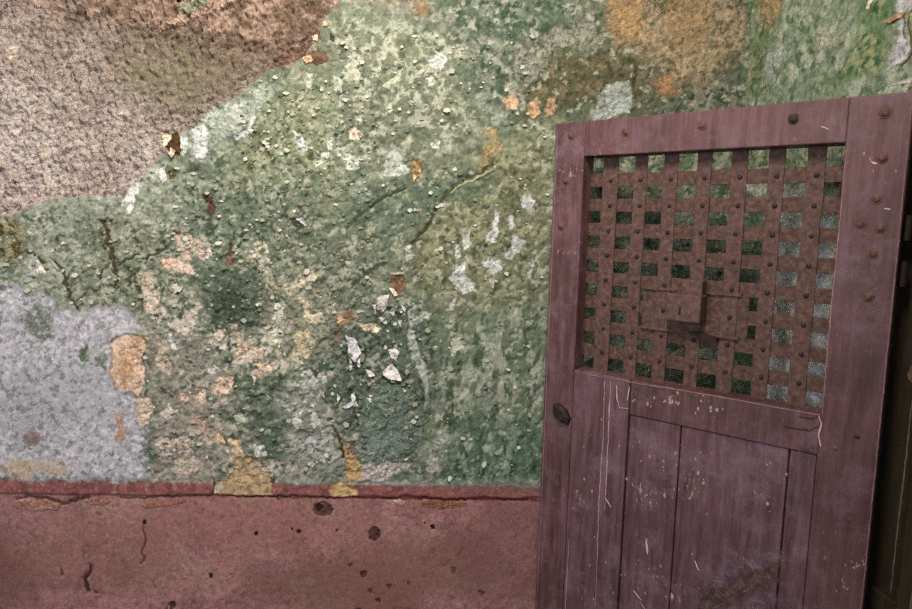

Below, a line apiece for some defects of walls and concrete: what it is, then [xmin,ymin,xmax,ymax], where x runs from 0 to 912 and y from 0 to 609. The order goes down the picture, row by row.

peeling [882,0,912,70]
peeling [460,18,605,138]
peeling [475,103,502,167]
flaking render [0,0,496,497]
crack [351,263,385,288]
crack [345,187,407,230]
crack [410,163,494,246]
peeling [443,157,536,289]
peeling [479,346,540,422]
flaking render [13,495,110,511]